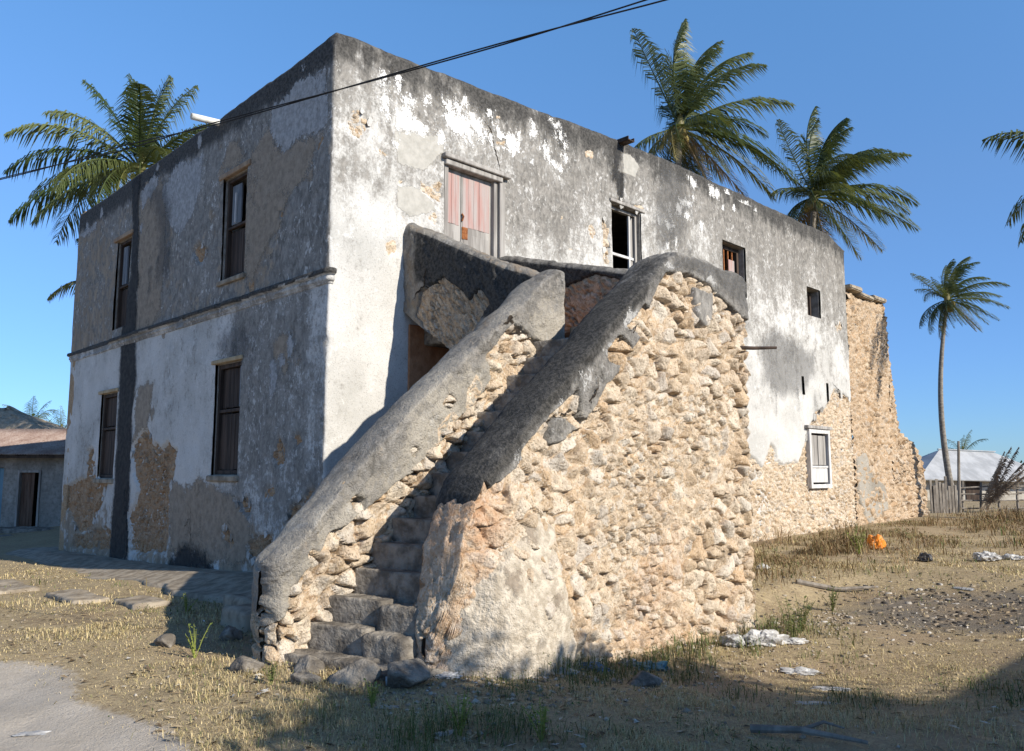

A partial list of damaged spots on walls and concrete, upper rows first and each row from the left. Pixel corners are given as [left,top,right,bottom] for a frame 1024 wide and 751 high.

peeling [348,67,570,175]
damp [110,176,140,560]
flaking render [68,447,111,550]
flaking render [130,381,273,567]
flaking render [748,389,859,543]